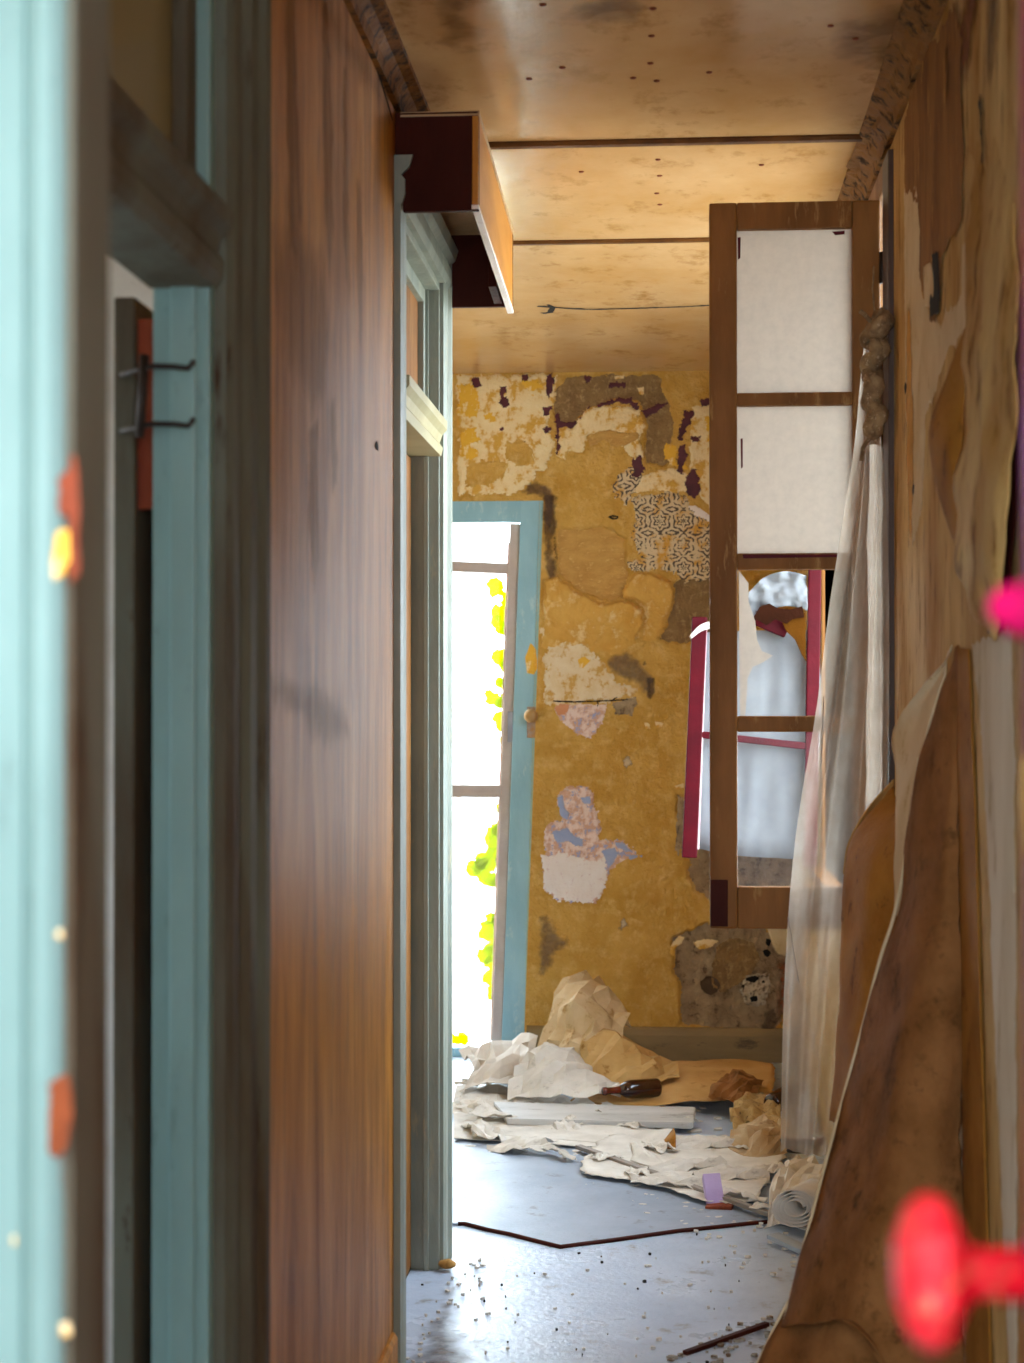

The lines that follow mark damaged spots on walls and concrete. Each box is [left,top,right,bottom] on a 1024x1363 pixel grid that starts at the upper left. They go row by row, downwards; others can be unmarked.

peeling [904,186,966,546]
peeling [455,373,709,505]
peeling [525,627,663,739]
peeling [541,785,642,904]
spalling [670,923,787,1028]